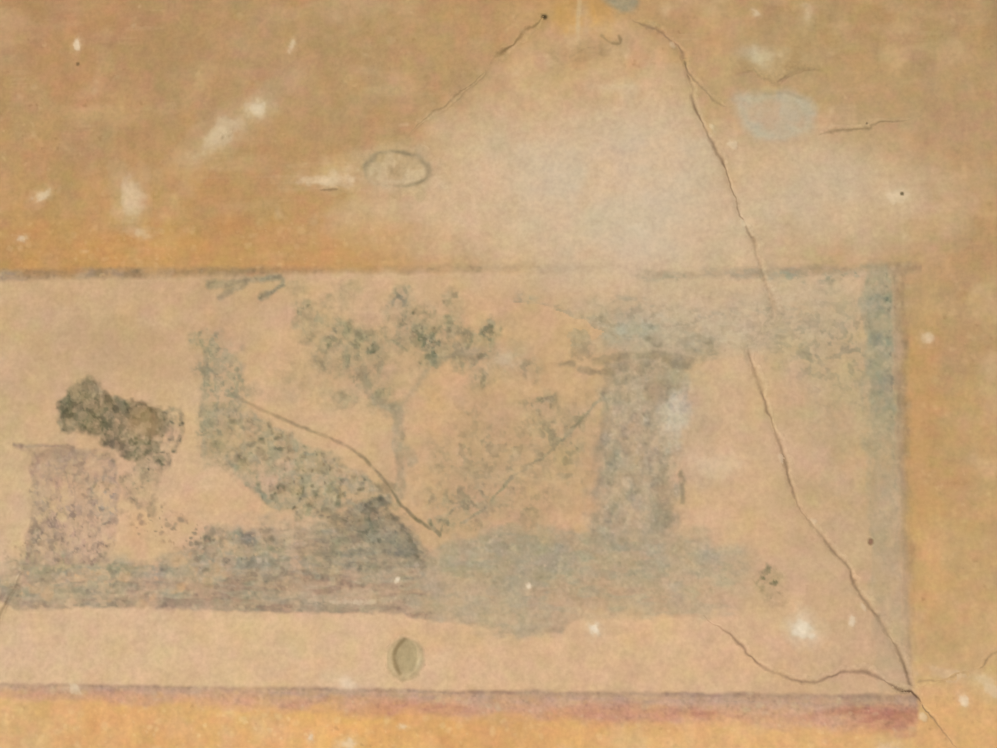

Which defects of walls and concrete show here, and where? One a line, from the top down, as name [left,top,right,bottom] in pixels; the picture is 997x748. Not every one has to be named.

crack [407,16,544,137]
crack [631,18,997,748]
crack [0,570,24,623]